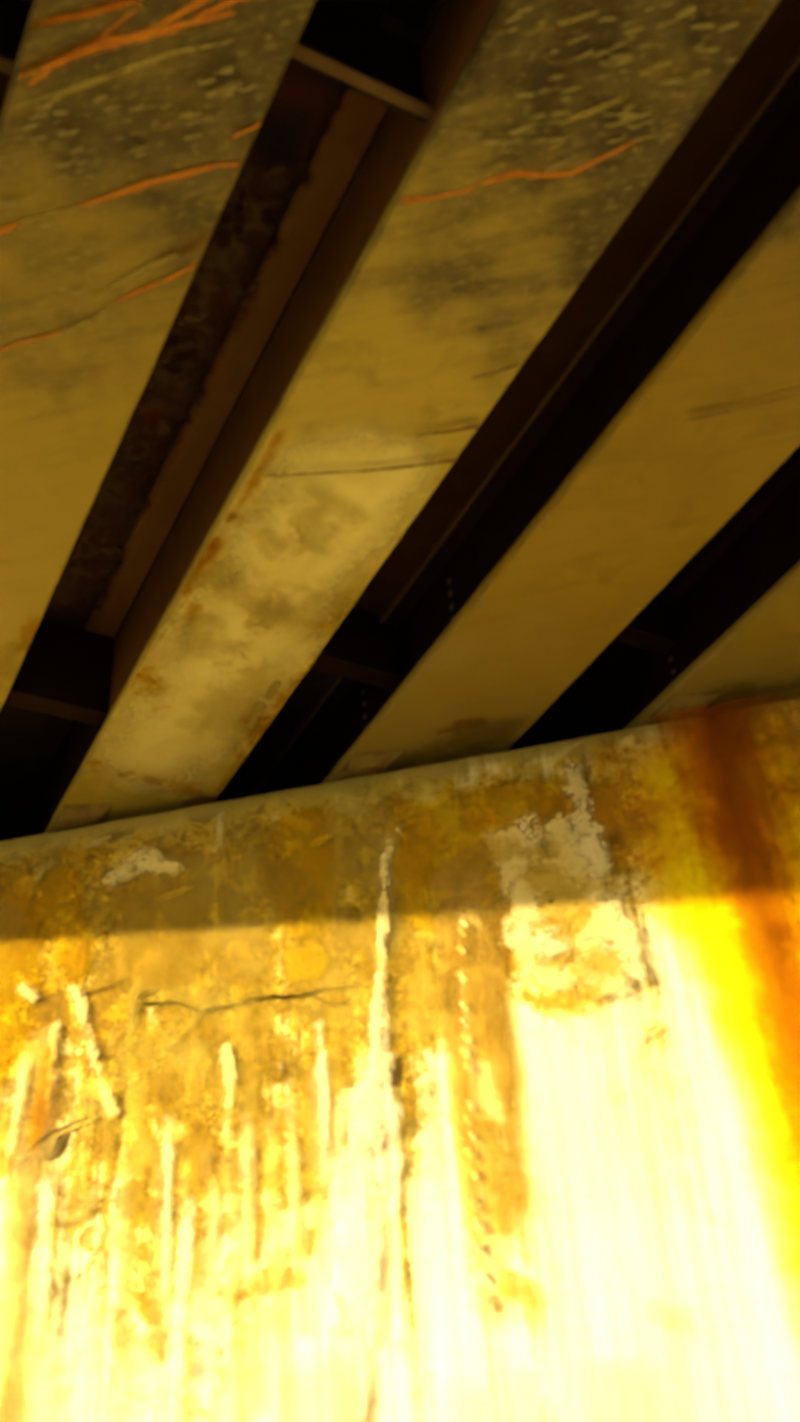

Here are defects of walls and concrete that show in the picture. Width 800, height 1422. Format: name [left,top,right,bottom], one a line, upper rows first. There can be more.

corrosion [0,59,348,619]
water stain [318,829,401,1190]
water stain [456,919,469,983]
water stain [458,1000,474,1073]
peeling [487,741,646,1000]
water stain [147,1205,190,1392]
water stain [463,1099,495,1311]